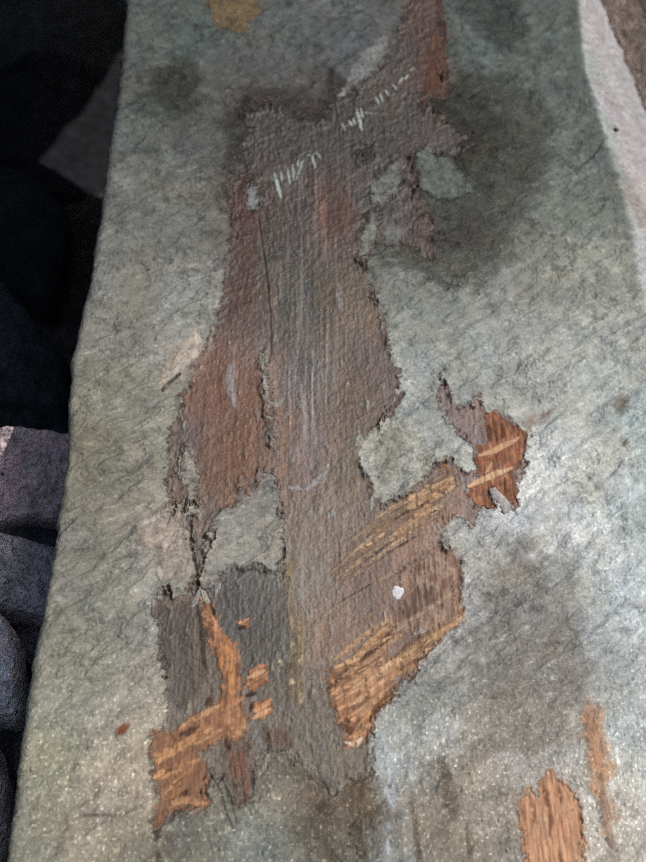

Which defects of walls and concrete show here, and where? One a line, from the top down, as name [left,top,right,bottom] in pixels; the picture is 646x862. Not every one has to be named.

peeling [132,0,533,812]
peeling [148,803,195,827]